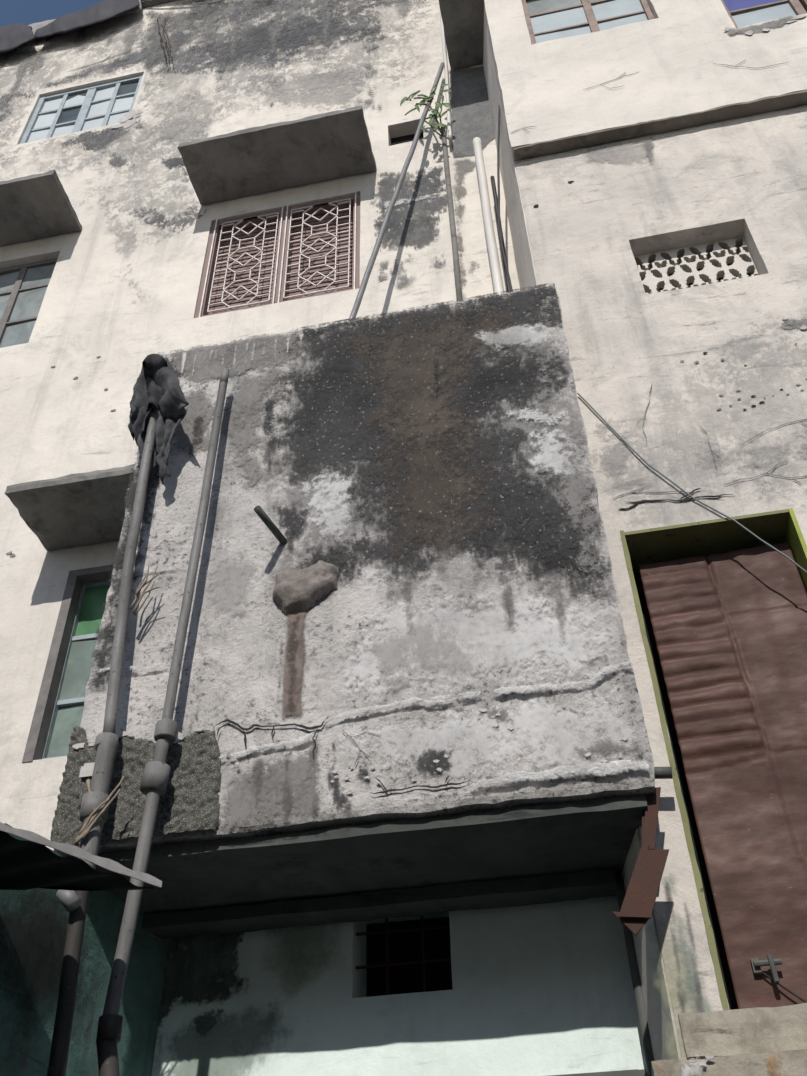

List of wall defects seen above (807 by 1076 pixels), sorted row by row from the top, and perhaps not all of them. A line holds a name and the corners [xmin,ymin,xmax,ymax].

leakage [0,0,426,133]
leakage [62,116,143,166]
leakage [116,206,202,245]
leakage [159,157,633,675]
crack [615,426,807,510]
crack [743,419,807,444]
leakage [88,437,160,689]
rust [277,611,306,716]
leakage [345,611,467,694]
spalling [50,725,97,844]
spalling [100,727,221,842]
crack [215,715,470,794]